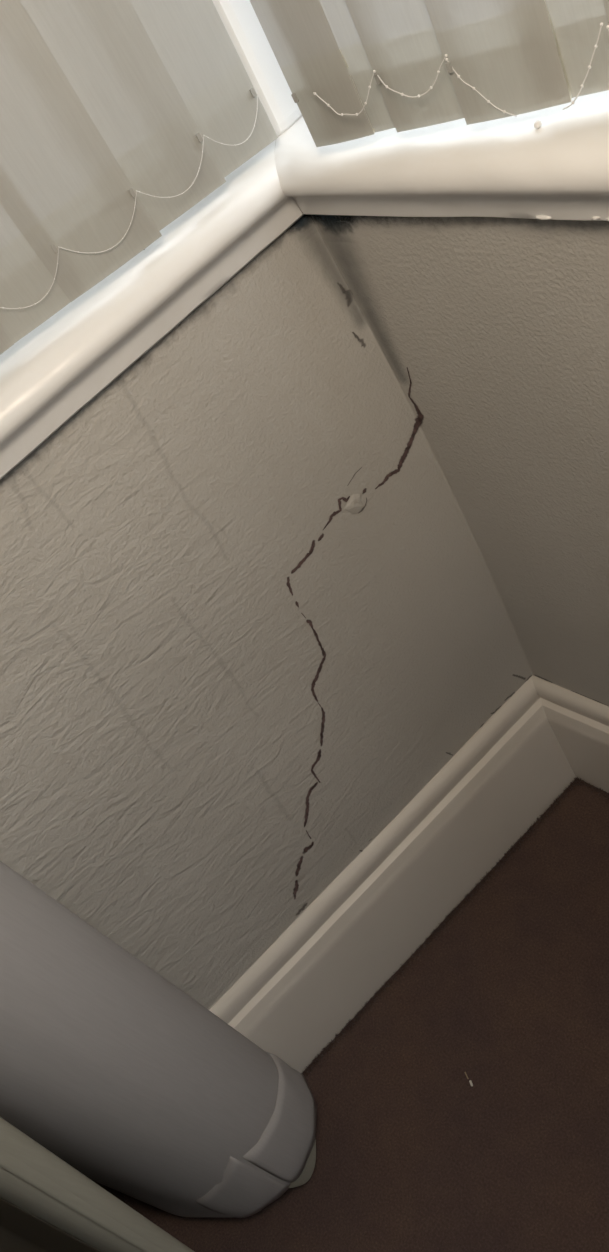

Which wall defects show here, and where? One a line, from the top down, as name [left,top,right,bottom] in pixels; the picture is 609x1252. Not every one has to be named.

crack [287,368,424,899]